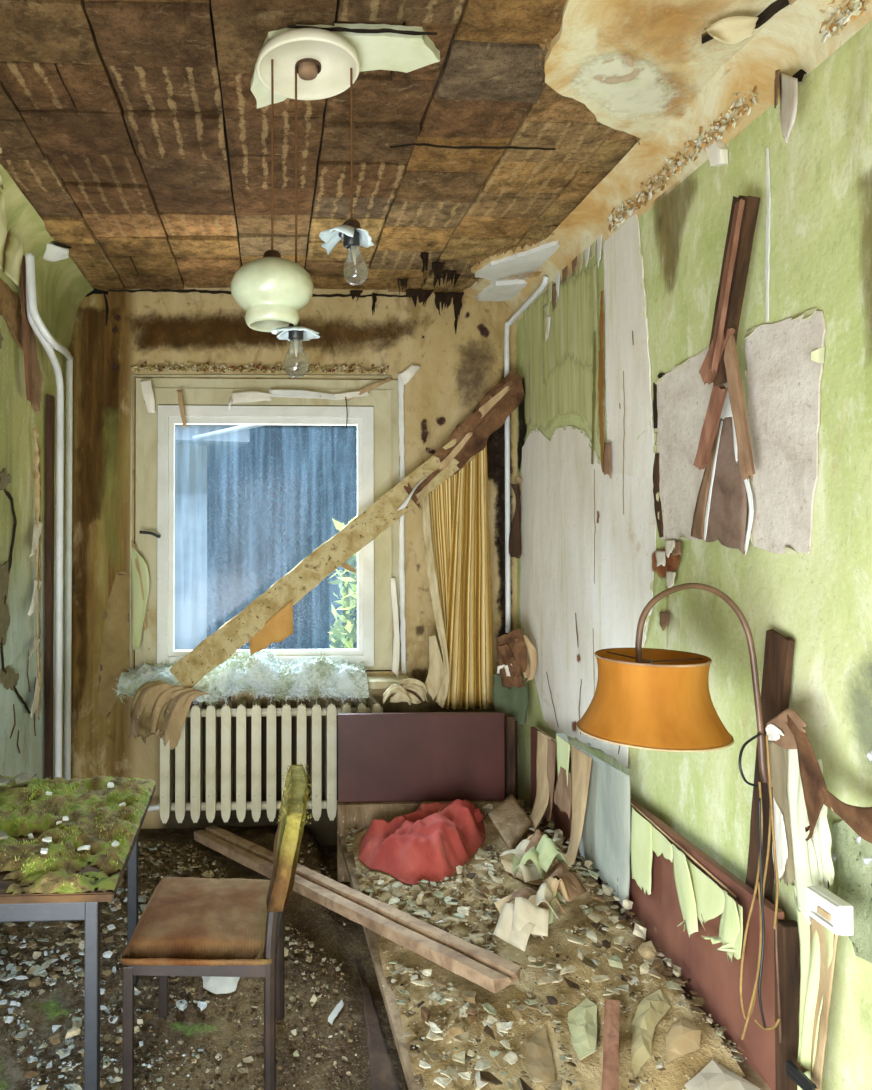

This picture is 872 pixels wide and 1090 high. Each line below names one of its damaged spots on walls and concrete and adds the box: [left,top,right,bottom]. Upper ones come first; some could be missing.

flaking render [701,0,797,45]
flaking render [819,0,872,43]
peeling [774,69,807,144]
leakage [466,312,489,337]
leakage [458,348,488,401]
flaking render [0,0,757,885]
leakage [421,417,445,454]
leakage [76,308,424,718]
leakage [413,669,426,683]
peeling [630,802,743,962]